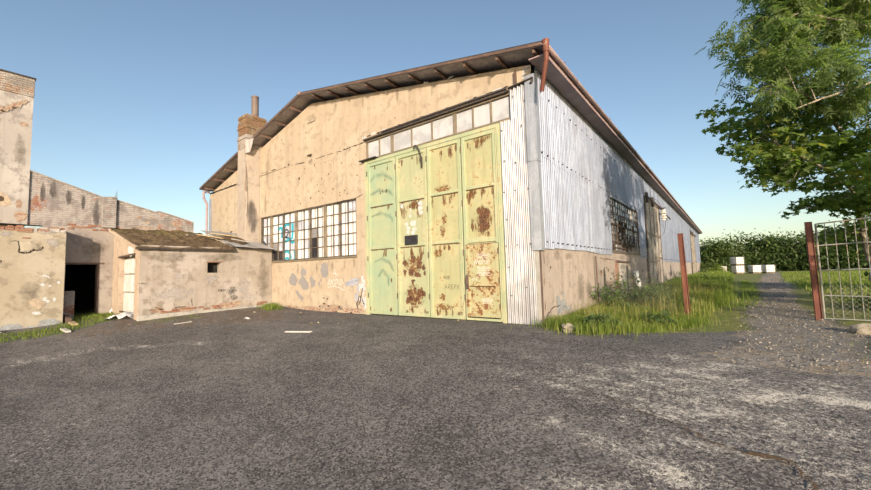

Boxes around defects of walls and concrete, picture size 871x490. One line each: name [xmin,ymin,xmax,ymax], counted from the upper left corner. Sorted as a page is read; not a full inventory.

flaking render [0,191,27,222]
water stain [248,202,256,231]
corrosion [371,185,494,315]